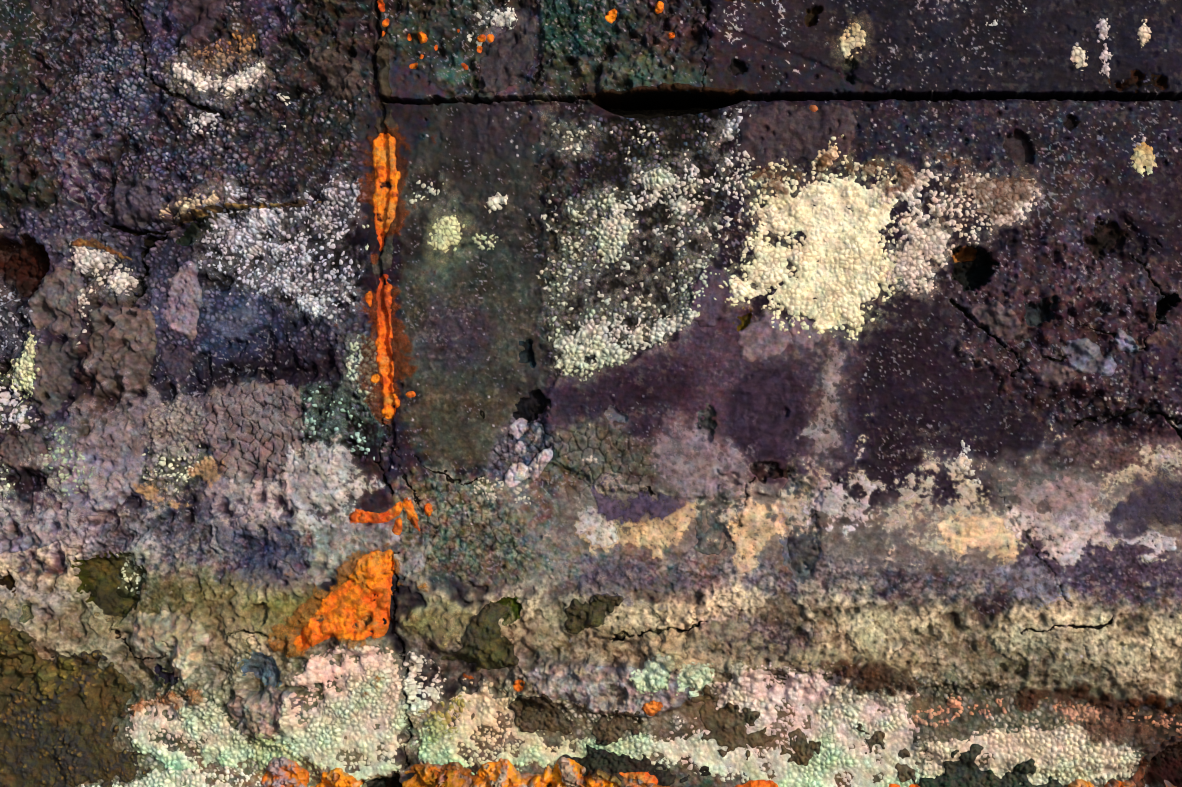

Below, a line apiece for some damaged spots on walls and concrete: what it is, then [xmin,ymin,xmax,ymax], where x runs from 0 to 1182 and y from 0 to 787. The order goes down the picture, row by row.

corrosion [355,125,418,425]
crack [949,298,1066,377]
crack [1072,408,1182,441]
crack [375,425,485,539]
corrosion [267,497,433,657]
crack [999,490,1114,635]
crack [392,552,413,767]
crack [610,621,708,641]
corrosion [821,655,924,699]
corrosion [261,756,364,787]
corrosion [401,757,670,787]
corrosion [1014,680,1182,787]